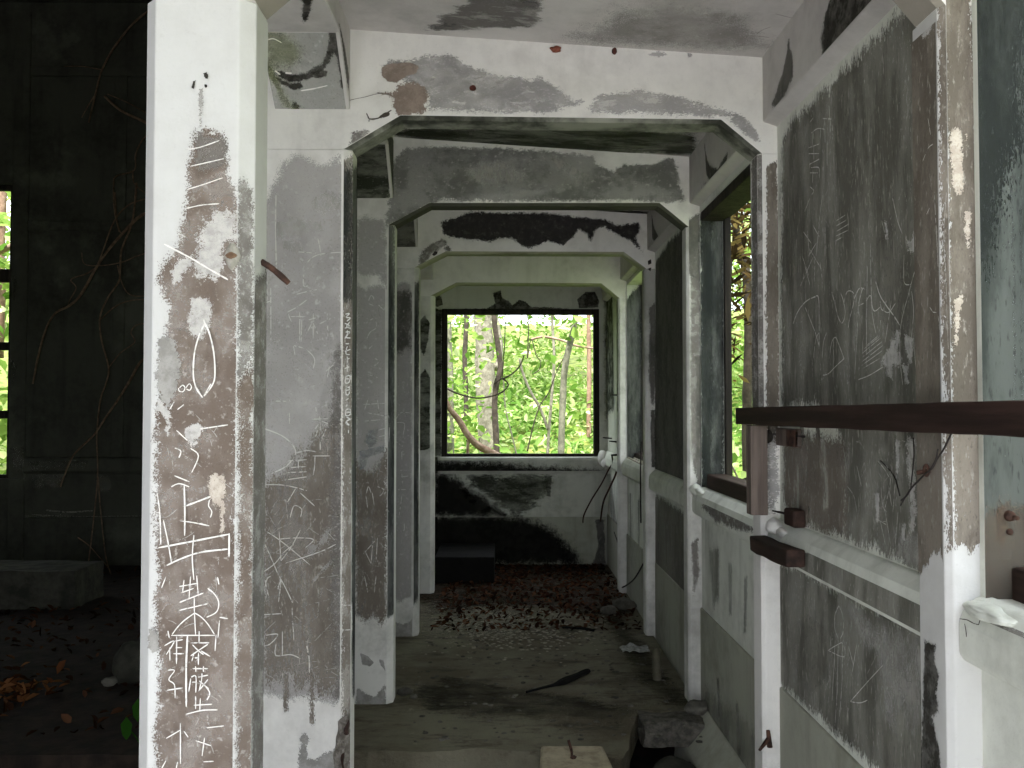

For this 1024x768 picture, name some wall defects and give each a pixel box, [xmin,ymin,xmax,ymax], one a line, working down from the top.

spalling [381,62,430,116]
peeling [948,127,967,196]
peeling [168,206,237,285]
leakage [381,0,1024,407]
peeling [963,211,972,248]
peeling [187,297,213,340]
peeling [953,295,964,345]
peeling [154,335,182,436]
peeling [184,423,203,447]
leakage [150,88,728,768]
peeling [207,473,226,533]
leakage [767,426,1024,599]